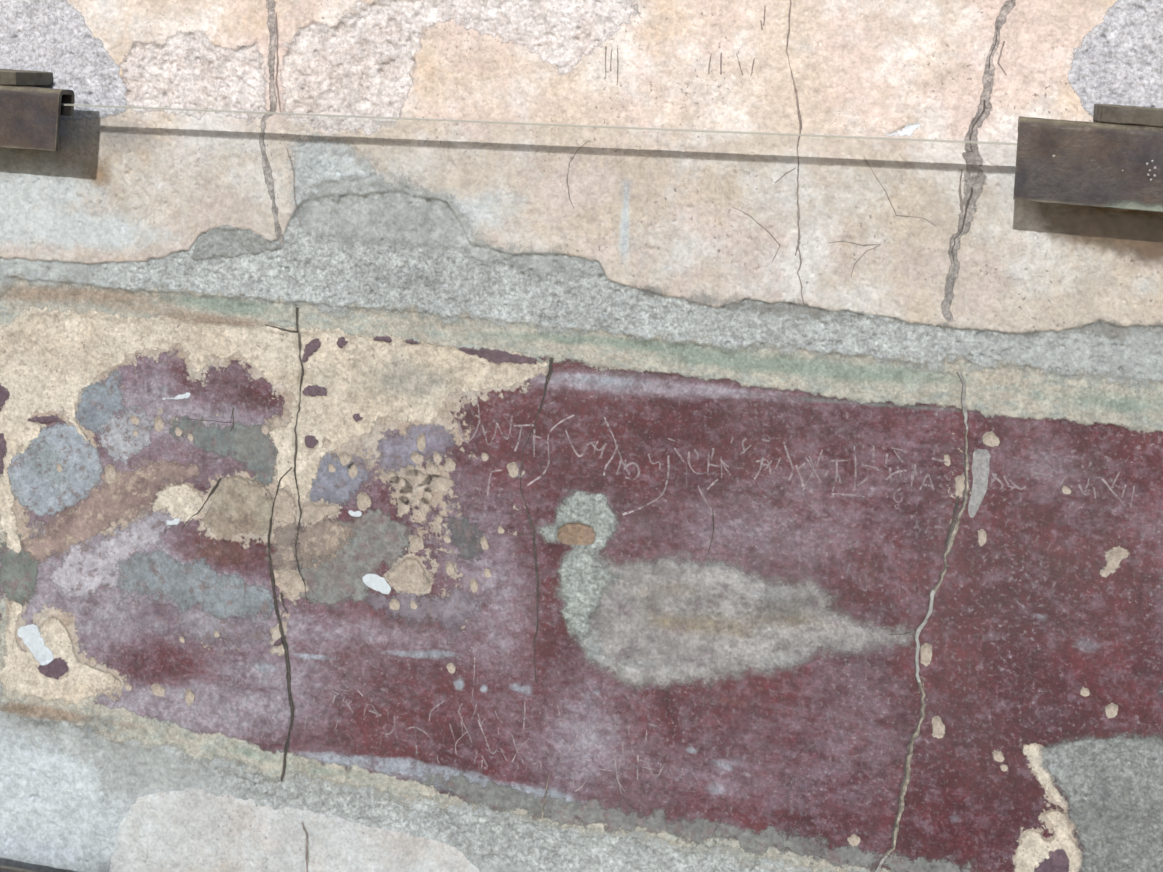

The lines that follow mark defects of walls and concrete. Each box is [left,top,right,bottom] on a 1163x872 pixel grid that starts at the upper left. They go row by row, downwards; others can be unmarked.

crack [259,0,301,246]
flaking render [119,0,639,216]
crack [733,0,804,305]
crack [863,0,1016,322]
peeling [0,600,132,705]
peeling [0,305,549,650]
crack [265,307,308,782]
crack [300,823,308,872]
crack [874,371,969,872]
peeling [992,750,1008,772]
peeling [1013,743,1083,872]
peeling [1105,703,1118,719]